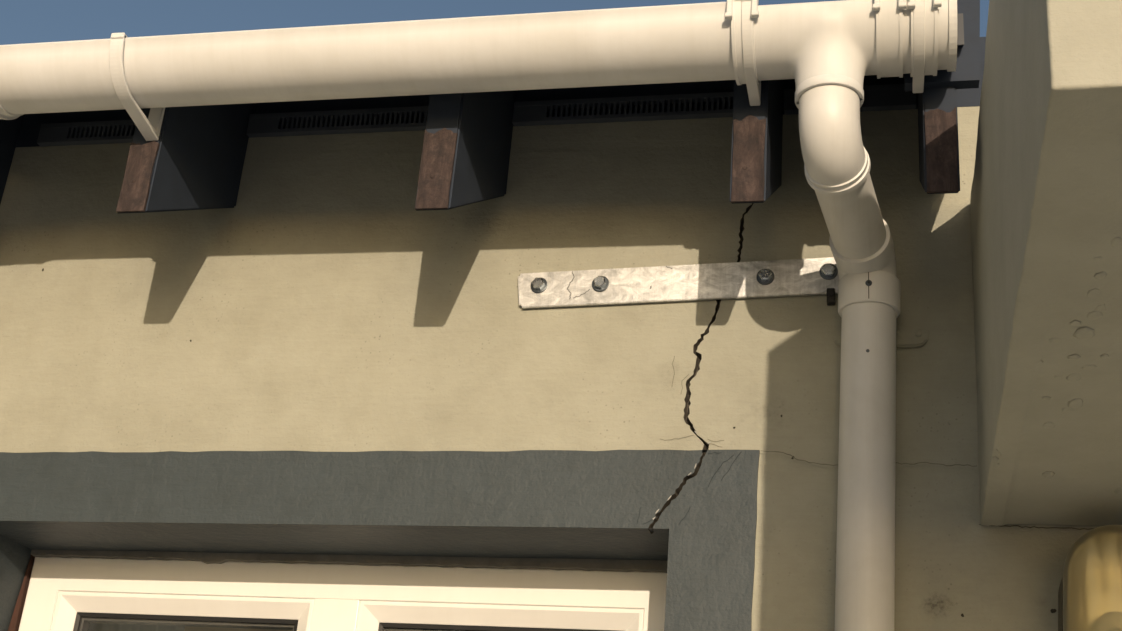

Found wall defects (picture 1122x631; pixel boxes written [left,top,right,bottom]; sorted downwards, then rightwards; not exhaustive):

crack [737,203,753,262]
crack [637,300,835,534]